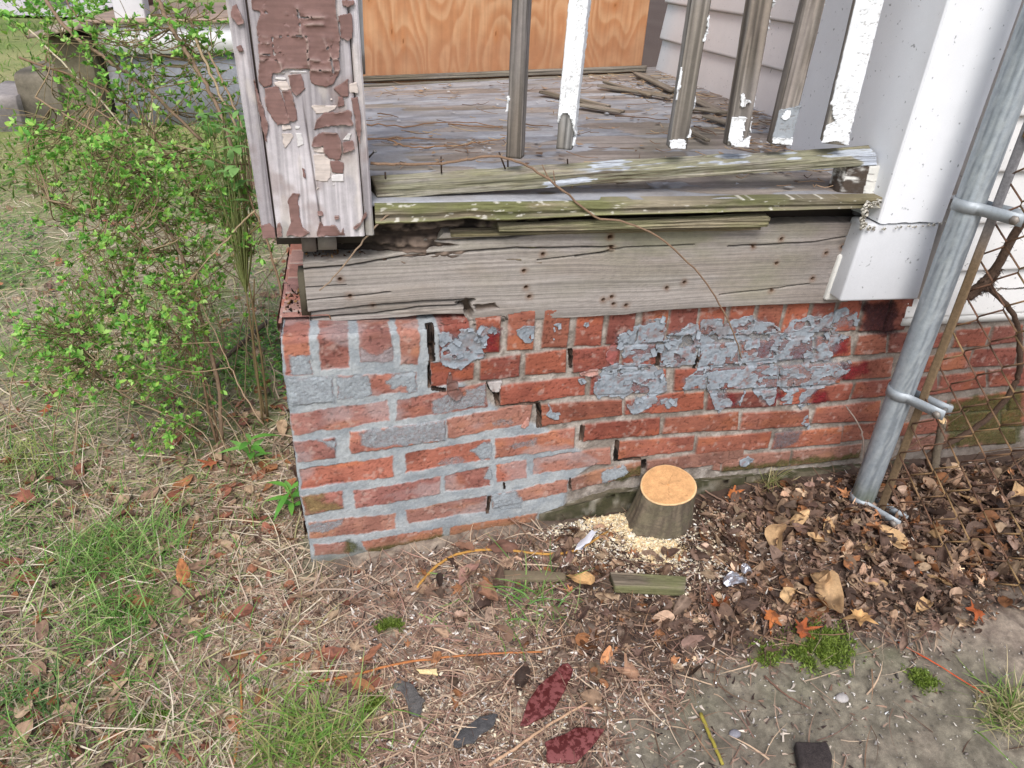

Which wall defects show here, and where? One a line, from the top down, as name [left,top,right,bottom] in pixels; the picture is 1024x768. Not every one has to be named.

peeling [231,0,361,189]
peeling [261,193,367,239]
crack [425,320,448,392]
peeling [438,325,499,401]
peeling [516,325,535,343]
crack [566,348,574,368]
peeling [578,307,860,430]
crack [486,381,542,428]
crack [578,425,586,441]
crack [613,440,646,468]
crack [486,482,506,514]